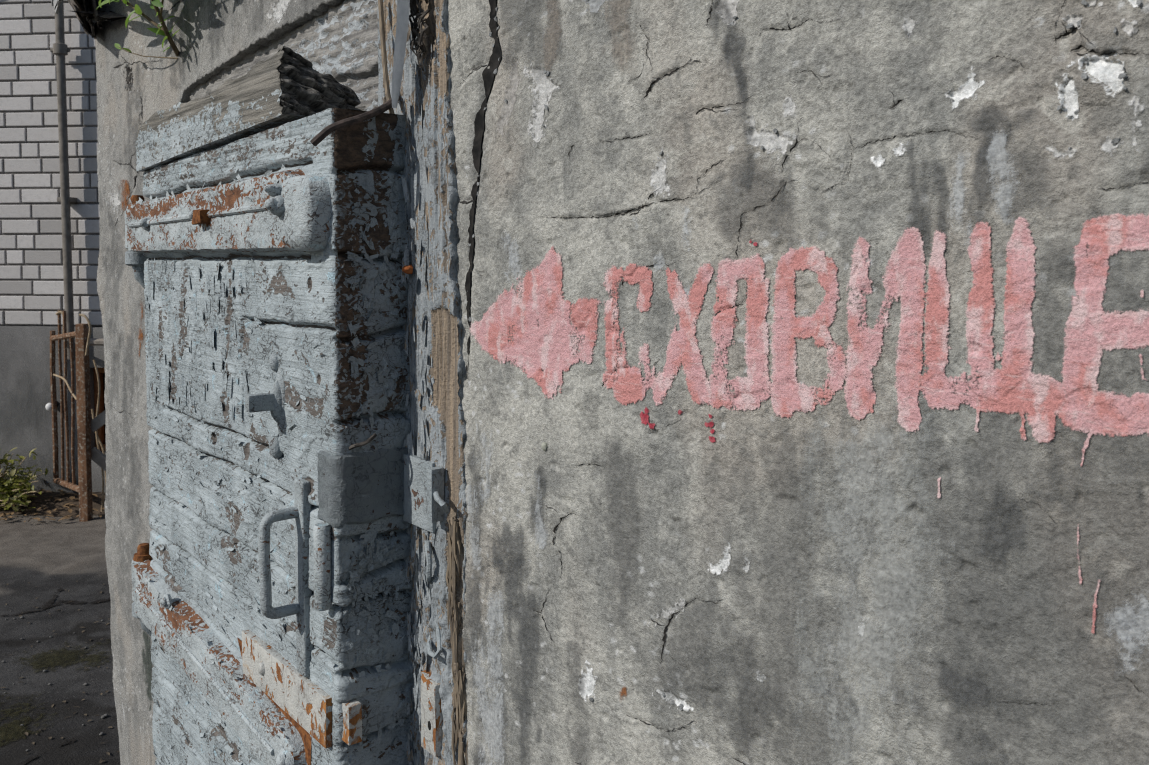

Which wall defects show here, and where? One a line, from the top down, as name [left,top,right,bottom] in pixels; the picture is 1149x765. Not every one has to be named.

peeling [523,63,559,144]
crack [628,25,702,98]
leakage [726,32,746,102]
peeling [945,66,985,110]
peeling [1055,53,1144,156]
peeling [344,8,432,461]
crack [458,0,502,379]
crack [539,160,725,219]
crack [735,87,982,255]
leakage [910,110,1011,241]
leakage [463,435,538,765]
peeling [708,543,750,575]